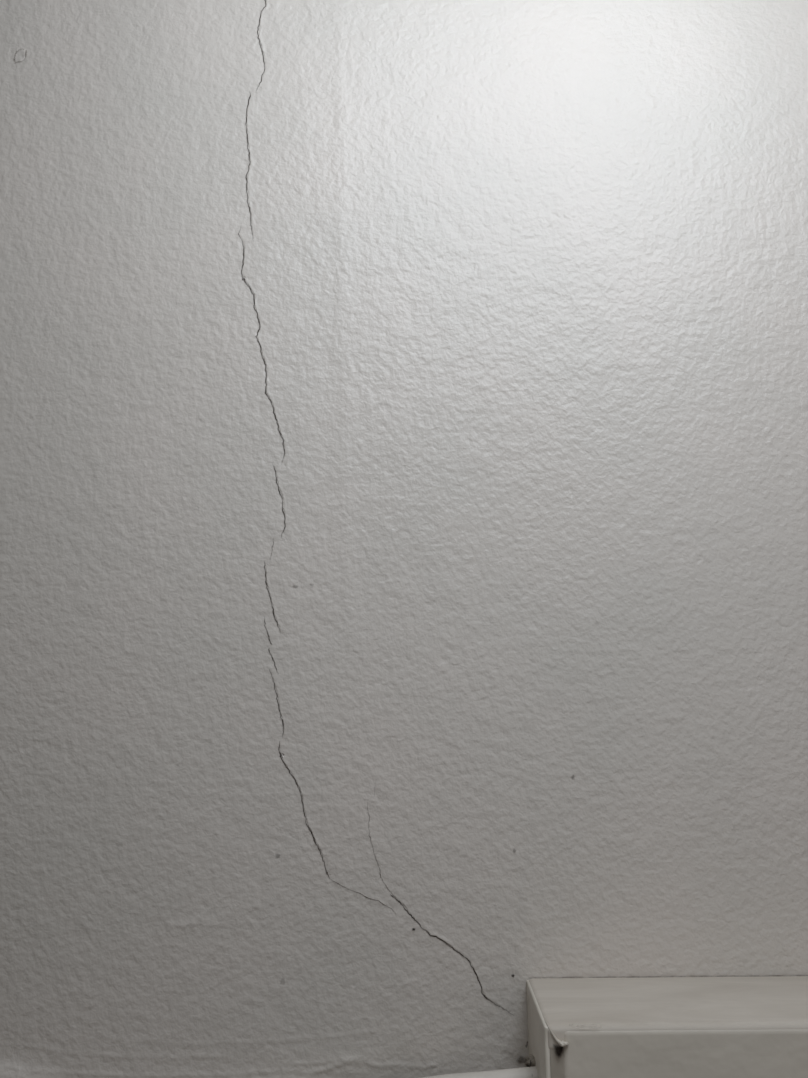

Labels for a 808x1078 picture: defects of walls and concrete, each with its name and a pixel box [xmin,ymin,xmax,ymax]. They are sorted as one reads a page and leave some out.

crack [238,0,516,1015]